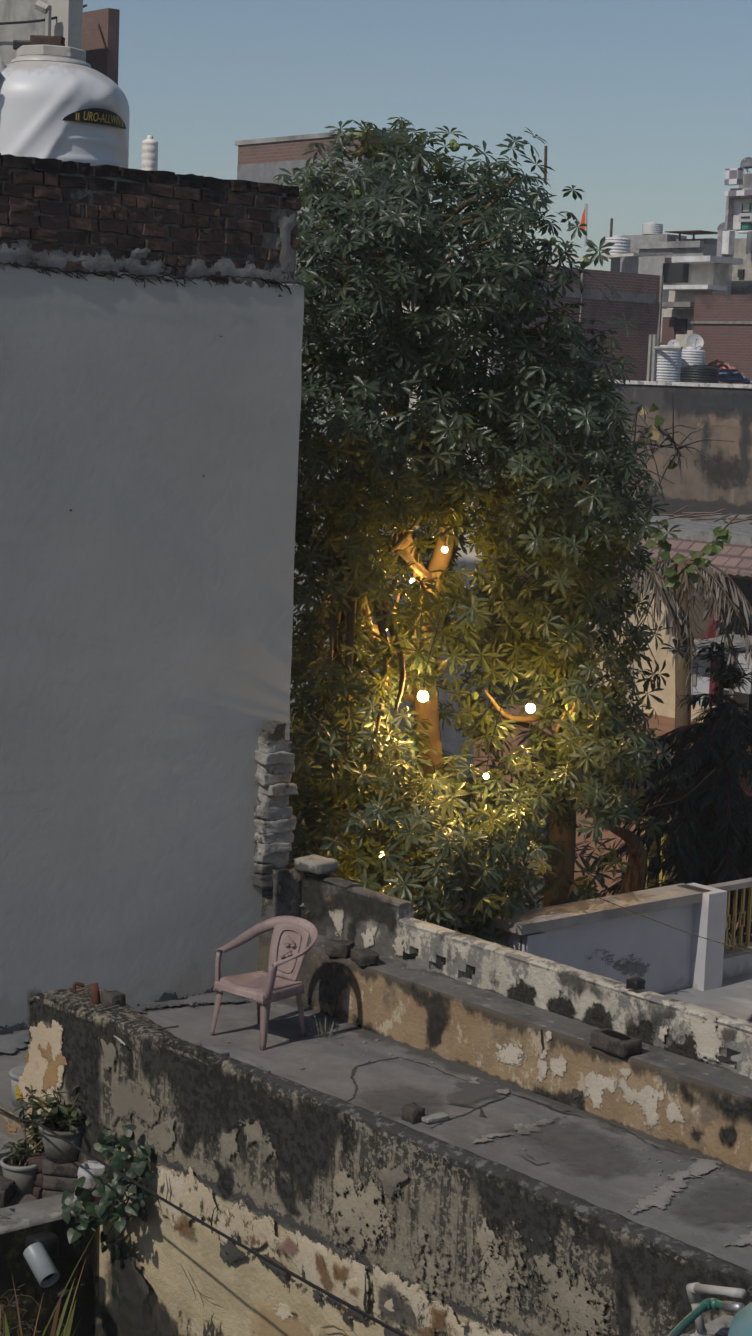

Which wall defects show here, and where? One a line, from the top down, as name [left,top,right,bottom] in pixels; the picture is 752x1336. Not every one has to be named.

peeling [0,262,307,294]
leakage [665,386,752,490]
leakage [557,970,608,997]
peeling [18,1020,67,1119]
leakage [0,990,354,1216]
crack [348,1029,685,1165]
peeling [532,1056,685,1129]
peeling [633,1011,724,1062]
leakage [681,1084,752,1147]
flaking render [98,1037,619,1336]
leakage [63,1221,215,1336]
leakage [469,1169,752,1336]